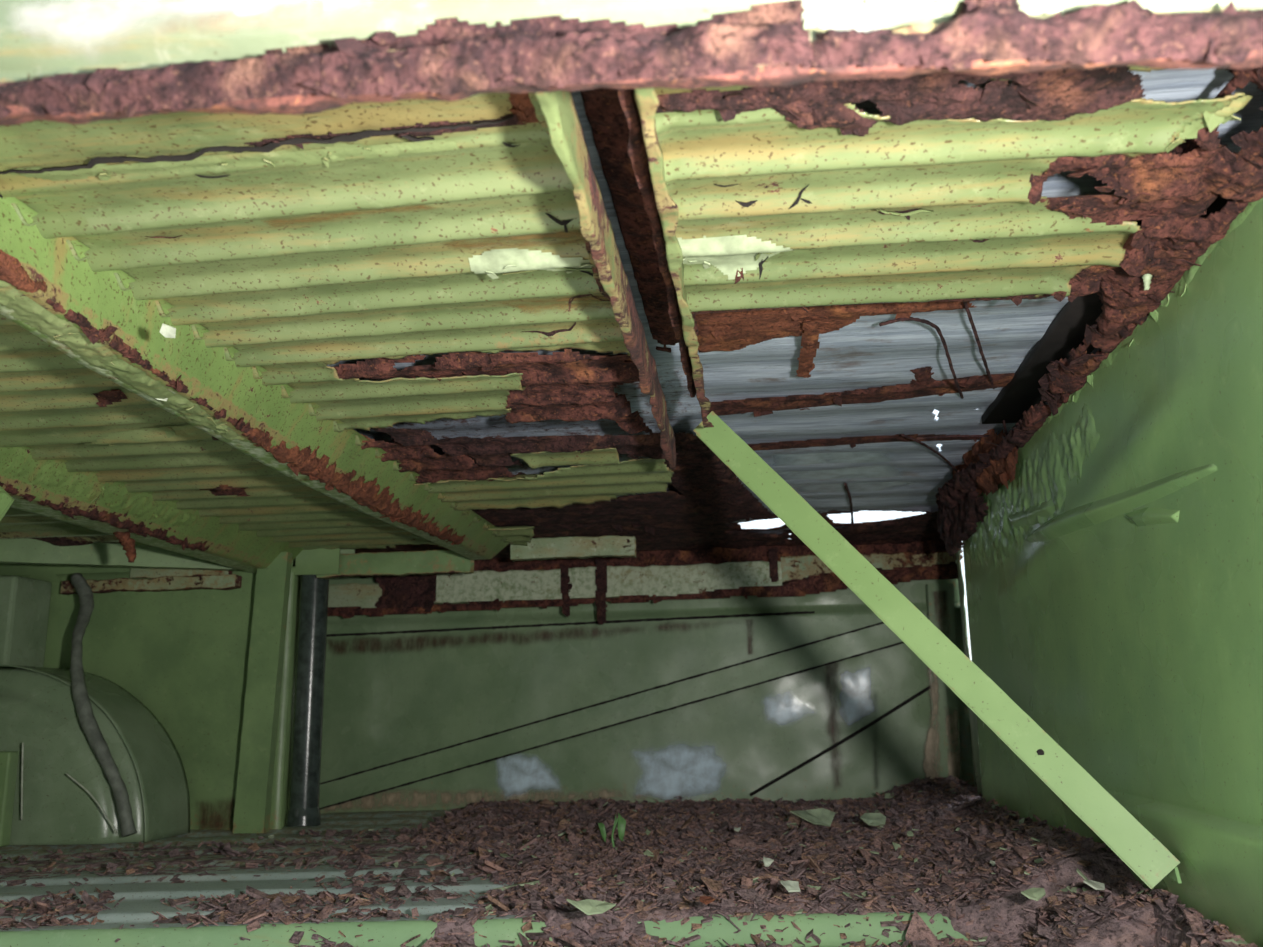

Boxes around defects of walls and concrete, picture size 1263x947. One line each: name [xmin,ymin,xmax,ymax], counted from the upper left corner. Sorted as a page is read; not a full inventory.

corrosion [0,0,1263,138]
corrosion [245,132,358,149]
corrosion [451,230,585,248]
corrosion [691,125,1263,625]
corrosion [0,249,466,545]
corrosion [328,349,848,625]
corrosion [0,482,210,563]
peeling [860,813,886,826]
peeling [781,880,800,892]
peeling [1021,888,1046,901]
peeling [1084,880,1105,890]